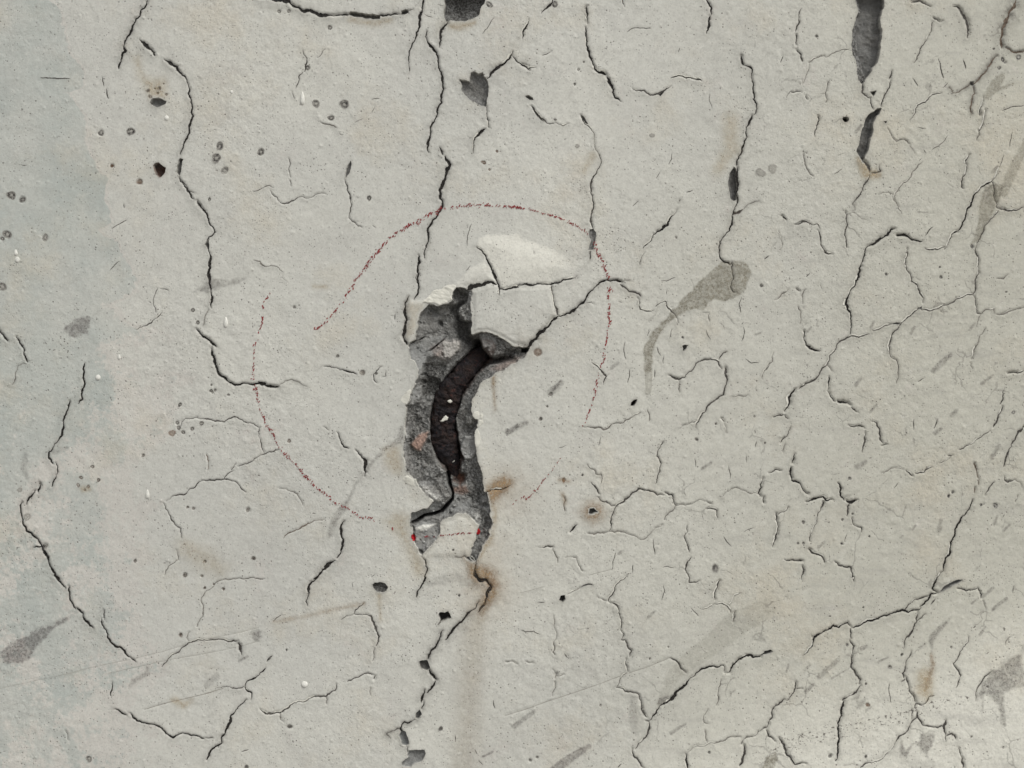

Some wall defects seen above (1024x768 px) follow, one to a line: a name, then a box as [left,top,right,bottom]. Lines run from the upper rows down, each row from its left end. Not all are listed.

crack [118,0,304,388]
crack [380,0,489,344]
spalling [444,0,493,22]
spalling [459,71,489,107]
spalling [728,167,743,216]
spalling [851,0,884,96]
spalling [856,108,887,163]
crack [467,210,678,347]
spalling [401,284,542,562]
crack [532,0,1024,768]
crack [20,363,136,662]
crack [110,603,380,759]